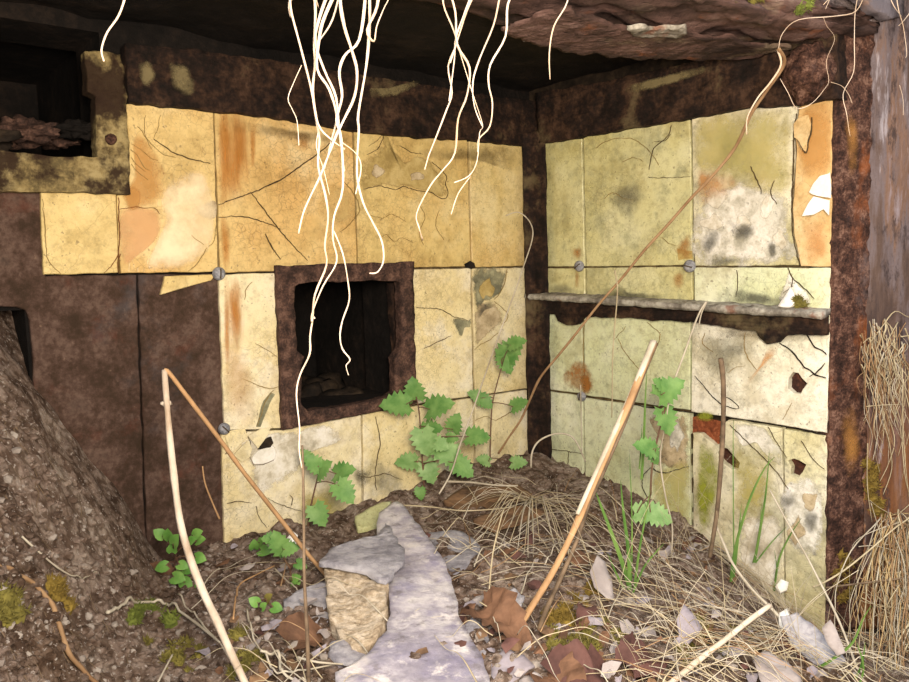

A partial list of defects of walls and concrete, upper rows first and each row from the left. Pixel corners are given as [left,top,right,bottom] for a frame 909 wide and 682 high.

corrosion [124,144,158,260]
crack [189,134,339,271]
crack [750,113,814,298]
peeling [802,173,831,216]
corrosion [226,301,238,344]
spalling [225,392,340,491]
corrosion [564,365,592,393]
spalling [650,416,740,468]
crack [695,376,826,488]
hole [792,373,807,393]
crack [779,335,827,378]
peeling [740,459,822,589]